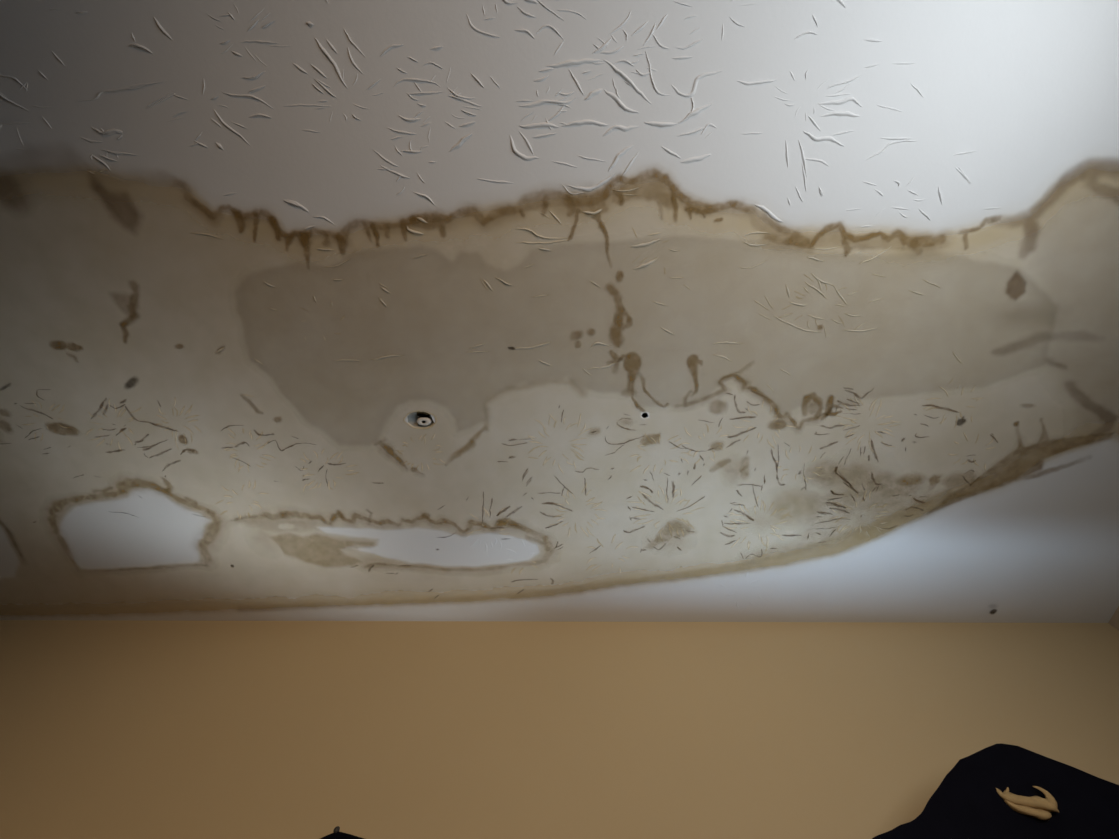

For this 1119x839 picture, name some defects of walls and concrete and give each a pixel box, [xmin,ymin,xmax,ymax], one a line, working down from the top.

water stain [170,190,347,261]
water stain [366,171,1023,257]
water stain [611,307,662,409]
crack [100,401,185,477]
water stain [109,481,218,527]
crack [223,425,298,465]
crack [482,439,611,547]
crack [624,391,759,550]
water stain [719,374,796,427]
water stain [804,395,841,416]
crack [725,392,957,557]
water stain [817,510,923,554]